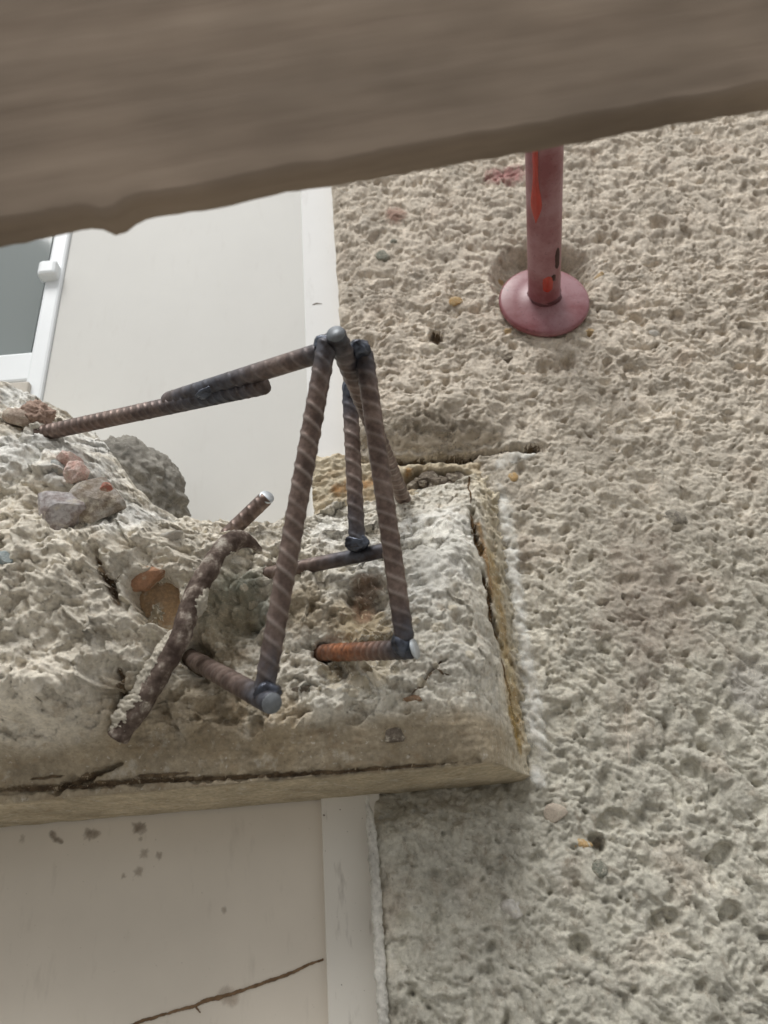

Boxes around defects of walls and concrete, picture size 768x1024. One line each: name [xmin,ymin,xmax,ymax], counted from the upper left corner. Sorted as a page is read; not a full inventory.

hole [429,331,444,351]
spalling [38,477,127,530]
spalling [409,529,461,586]
crack [397,444,540,723]
rust [107,530,263,744]
spalling [338,612,391,643]
spalling [291,660,395,698]
spalling [402,677,429,702]
crack [1,763,443,792]
crack [133,958,324,1024]